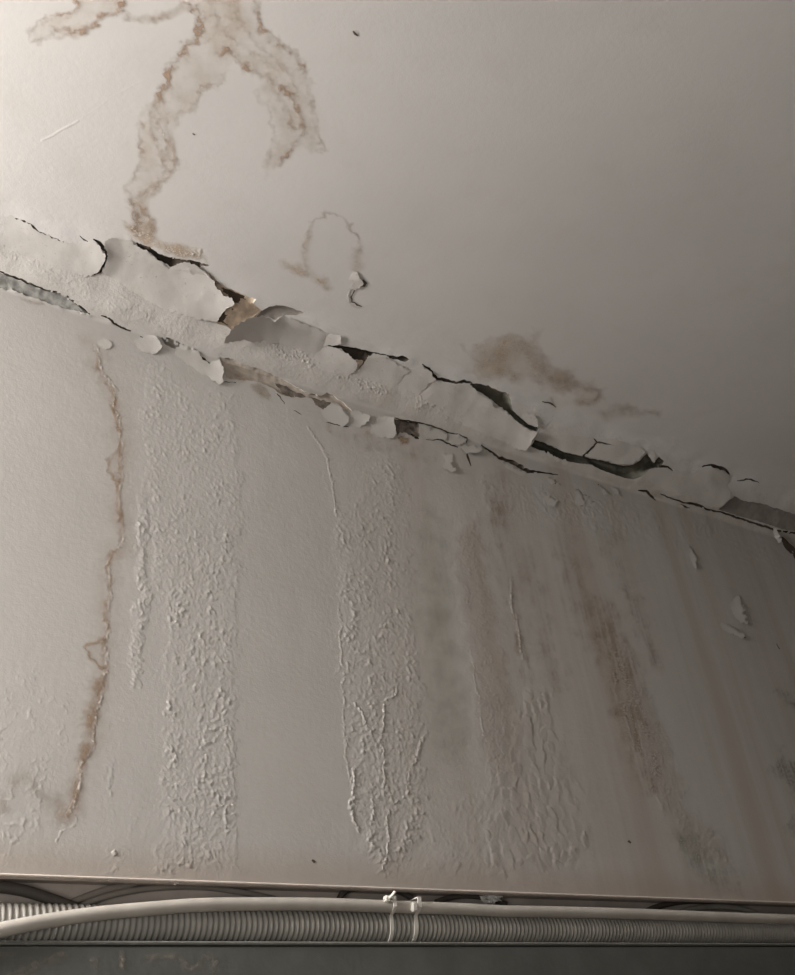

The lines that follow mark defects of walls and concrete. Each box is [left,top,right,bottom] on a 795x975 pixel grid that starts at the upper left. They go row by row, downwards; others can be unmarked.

water stain [178,4,204,57]
water stain [156,66,172,100]
crack [15,218,108,275]
crack [136,242,209,267]
crack [84,309,143,338]
peeling [0,215,731,508]
crack [328,345,539,431]
crack [395,418,558,484]
crack [702,464,759,483]
crack [638,490,795,558]